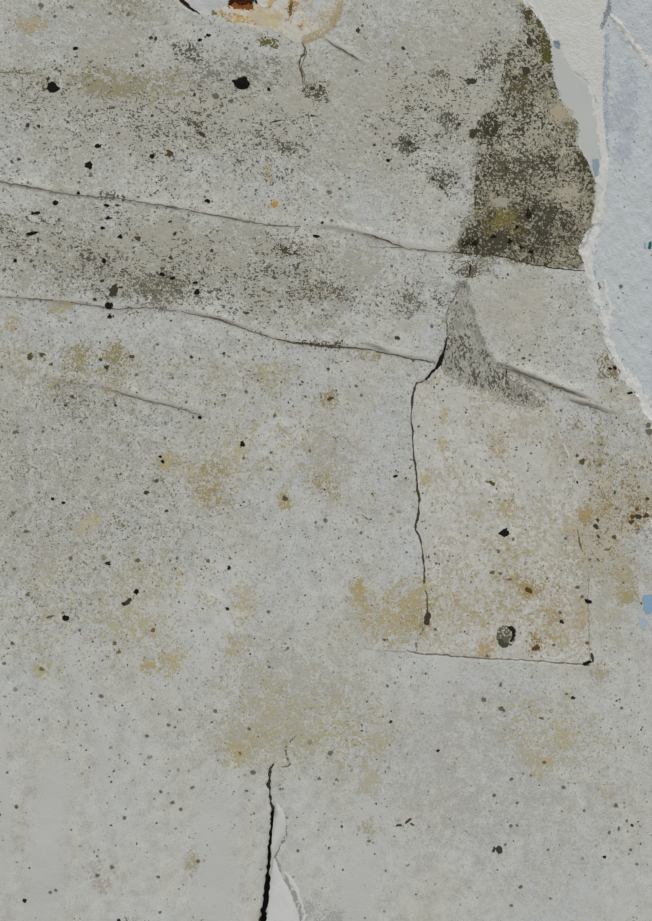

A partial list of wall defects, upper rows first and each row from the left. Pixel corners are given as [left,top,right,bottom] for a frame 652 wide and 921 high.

peeling [184,0,341,43]
crack [2,182,301,227]
peeling [521,0,652,409]
damp [0,0,640,521]
crack [497,366,612,414]
crack [1,234,591,666]
damp [483,600,540,672]